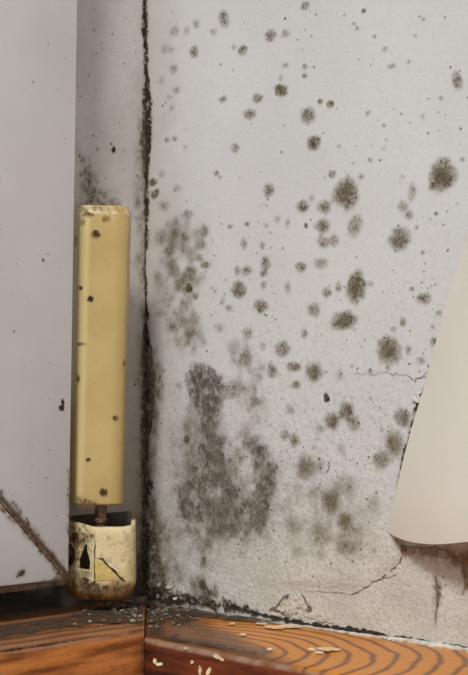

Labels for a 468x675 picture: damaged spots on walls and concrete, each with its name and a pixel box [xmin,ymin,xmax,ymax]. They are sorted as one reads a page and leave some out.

mould [429,158,456,191]
mould [333,179,357,208]
mould [389,224,409,252]
mould [324,270,365,303]
mould [131,0,322,617]
mould [331,311,356,329]
mould [378,337,399,368]
mould [307,363,327,380]
crack [360,371,428,385]
mould [326,397,360,428]
mould [368,395,421,480]
water stain [397,541,468,593]